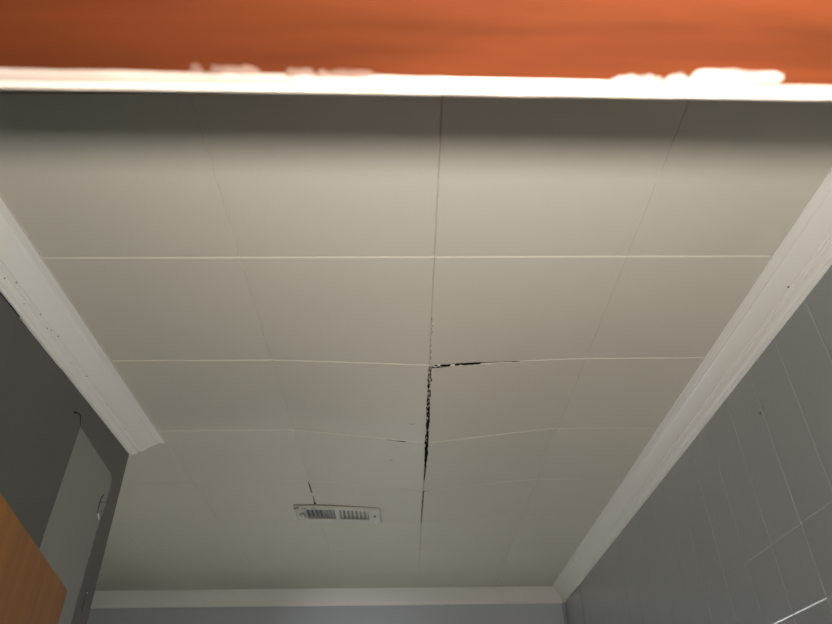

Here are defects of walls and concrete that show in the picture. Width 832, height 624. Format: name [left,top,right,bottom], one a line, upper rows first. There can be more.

crack [392,361,519,522]